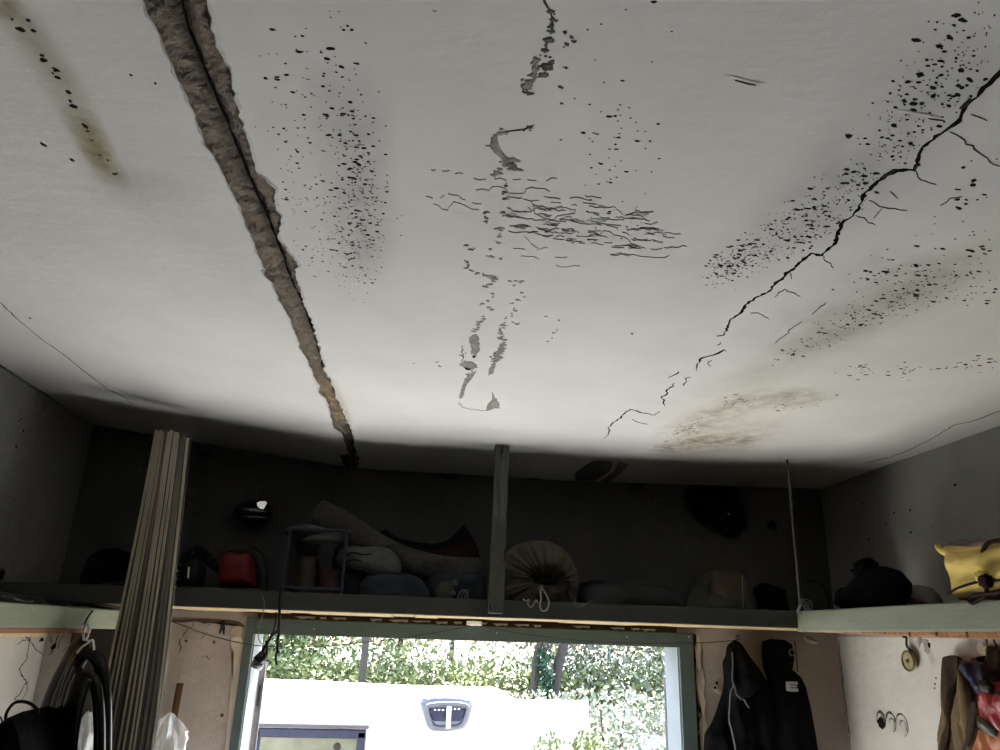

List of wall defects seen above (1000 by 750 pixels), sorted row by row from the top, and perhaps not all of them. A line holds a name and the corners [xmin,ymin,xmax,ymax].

leakage [39,54,78,109]
leakage [268,47,389,303]
peeling [520,0,577,96]
crack [426,169,687,267]
crack [605,70,1000,438]
leakage [703,2,995,285]
leakage [772,230,998,366]
crack [865,411,999,463]